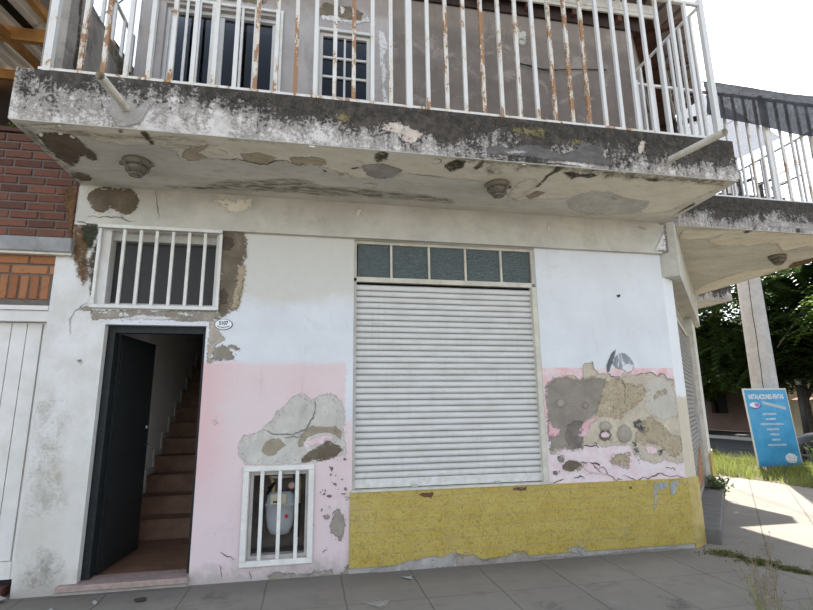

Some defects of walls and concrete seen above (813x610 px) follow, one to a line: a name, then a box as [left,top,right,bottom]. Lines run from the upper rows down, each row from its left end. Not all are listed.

peeling [22,122,733,216]
leakage [171,85,732,199]
peeling [678,229,813,251]
flaking render [80,232,248,363]
crack [266,403,316,438]
peeling [238,393,350,541]
peeling [545,361,684,477]
crack [554,442,684,483]
spalling [371,540,683,573]